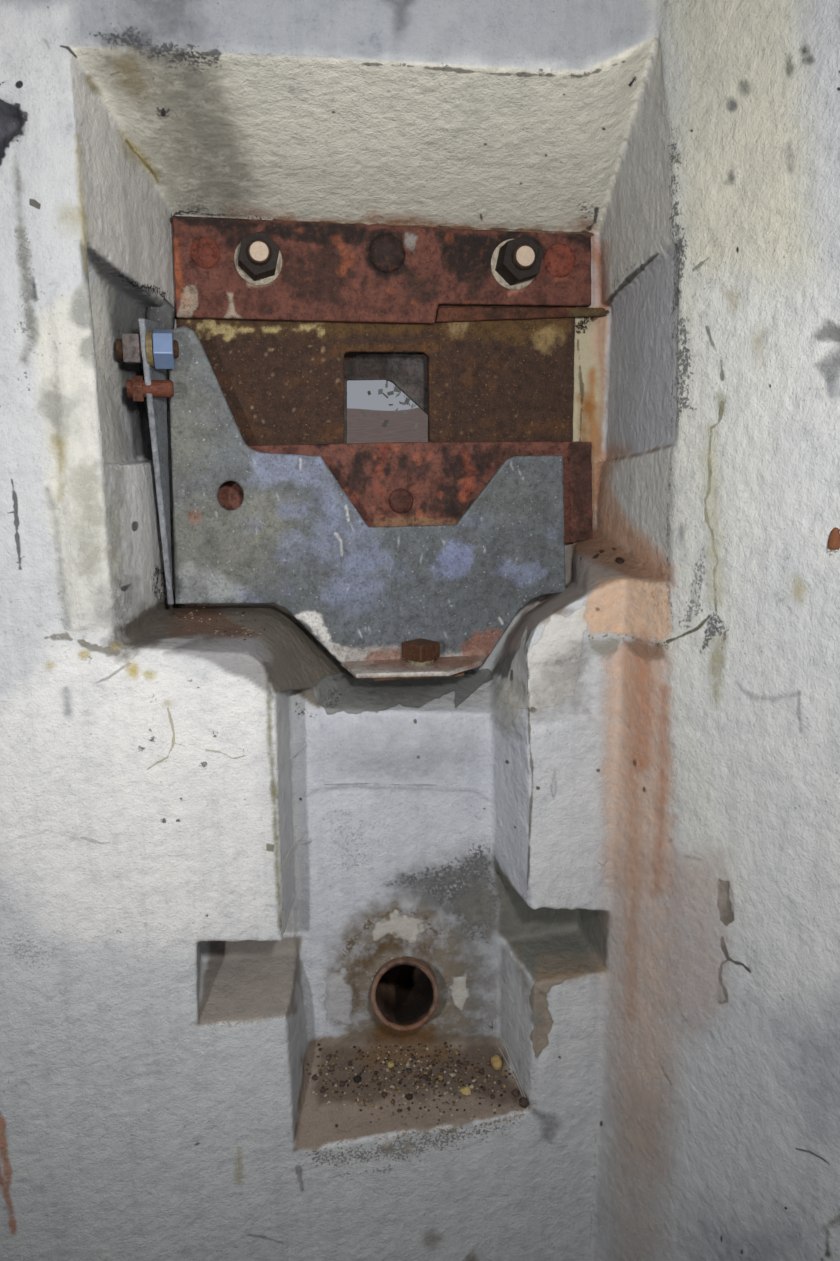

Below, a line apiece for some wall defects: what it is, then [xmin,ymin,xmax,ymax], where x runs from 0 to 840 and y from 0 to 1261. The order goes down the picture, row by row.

spalling [0,81,27,165]
damp [86,26,599,236]
crack [588,326,729,694]
corrosion [576,514,671,641]
damp [325,838,500,1040]
peeling [529,968,579,1057]
spalling [717,879,734,926]
crack [718,936,751,1004]
corrosion [0,1116,15,1233]